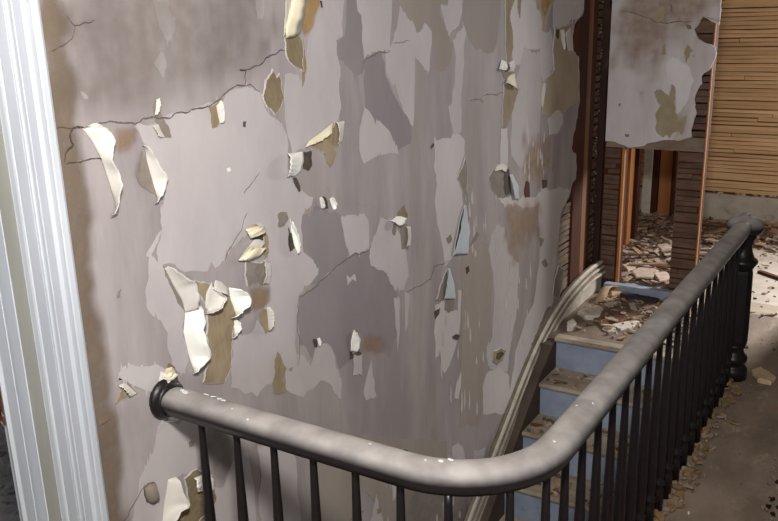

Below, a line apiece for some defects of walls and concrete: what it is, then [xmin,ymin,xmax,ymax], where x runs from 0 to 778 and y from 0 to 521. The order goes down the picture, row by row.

crack [52,16,93,51]
crack [62,50,285,164]
spalling [654,44,694,139]
peeling [83,123,123,217]
peeling [115,0,584,415]
crack [296,246,371,358]
peeling [133,417,301,521]
peeling [311,462,473,521]
peeling [351,431,485,459]